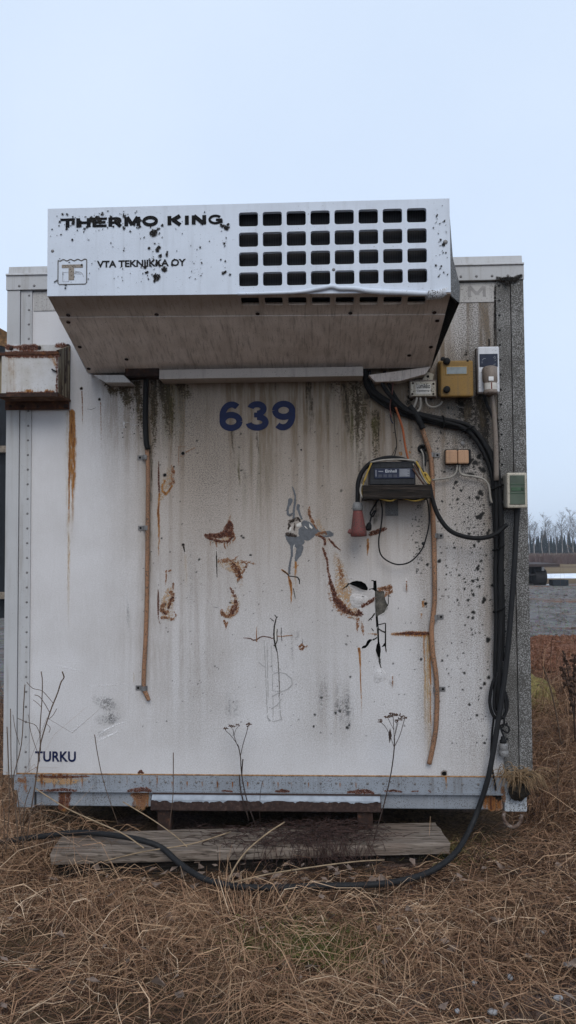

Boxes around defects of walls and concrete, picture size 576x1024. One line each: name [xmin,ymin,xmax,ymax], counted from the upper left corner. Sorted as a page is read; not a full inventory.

corrosion [5,343,70,393]
corrosion [68,409,77,518]
corrosion [157,462,175,555]
corrosion [157,569,177,623]
corrosion [204,517,254,628]
corrosion [308,506,393,635]
corrosion [18,773,88,811]
corrosion [127,770,158,810]